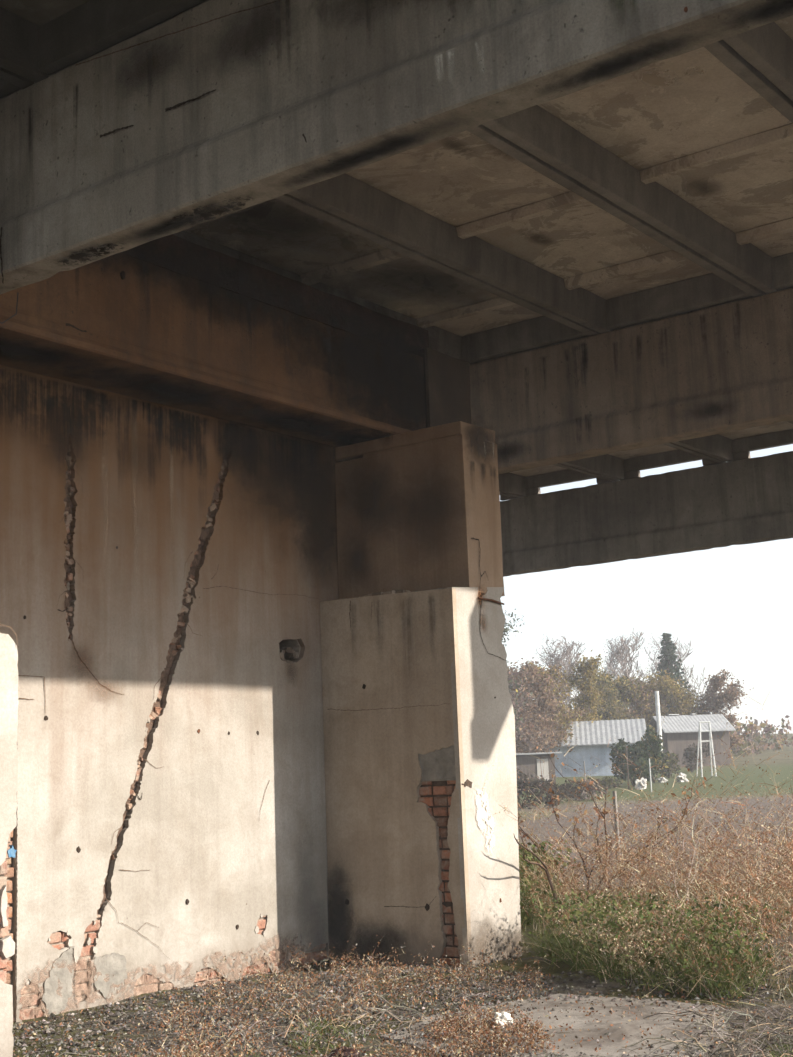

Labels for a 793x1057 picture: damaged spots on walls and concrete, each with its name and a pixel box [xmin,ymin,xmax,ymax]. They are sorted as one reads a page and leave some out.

water stain [563,43,704,87]
water stain [295,135,424,183]
water stain [58,243,123,265]
water stain [137,197,253,239]
crack [57,401,124,695]
crack [73,422,318,1008]
flaking render [418,745,460,967]
flaking render [0,835,44,1022]
flaking render [47,914,101,1003]
flaking render [133,974,176,996]
flaking render [254,914,268,937]
water stain [328,871,399,962]